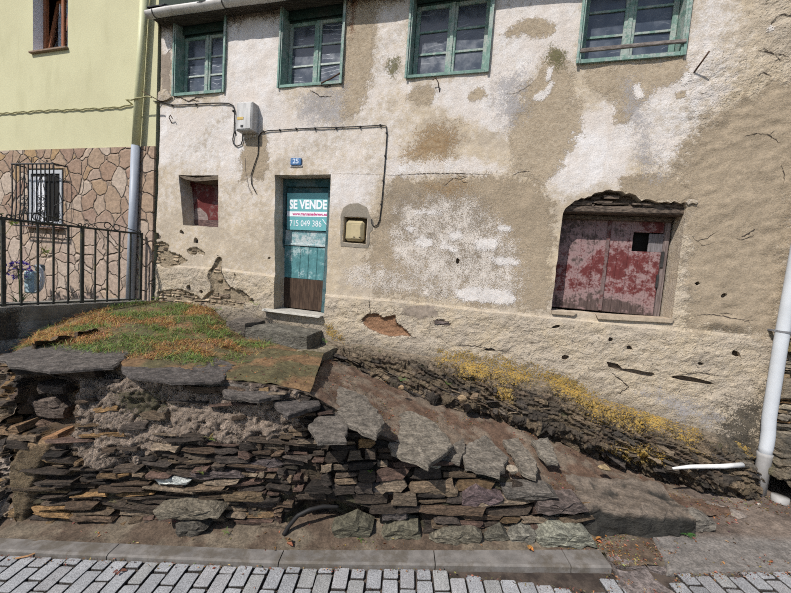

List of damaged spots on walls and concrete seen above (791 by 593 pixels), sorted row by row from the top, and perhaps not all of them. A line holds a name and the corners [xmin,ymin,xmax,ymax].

peeling [338,0,383,119]
peeling [503,15,556,40]
flaking render [156,234,205,268]
flaking render [156,257,254,309]
flaking render [363,313,411,336]
damp [371,117,524,301]
peeling [339,48,692,317]
peeling [618,78,791,345]